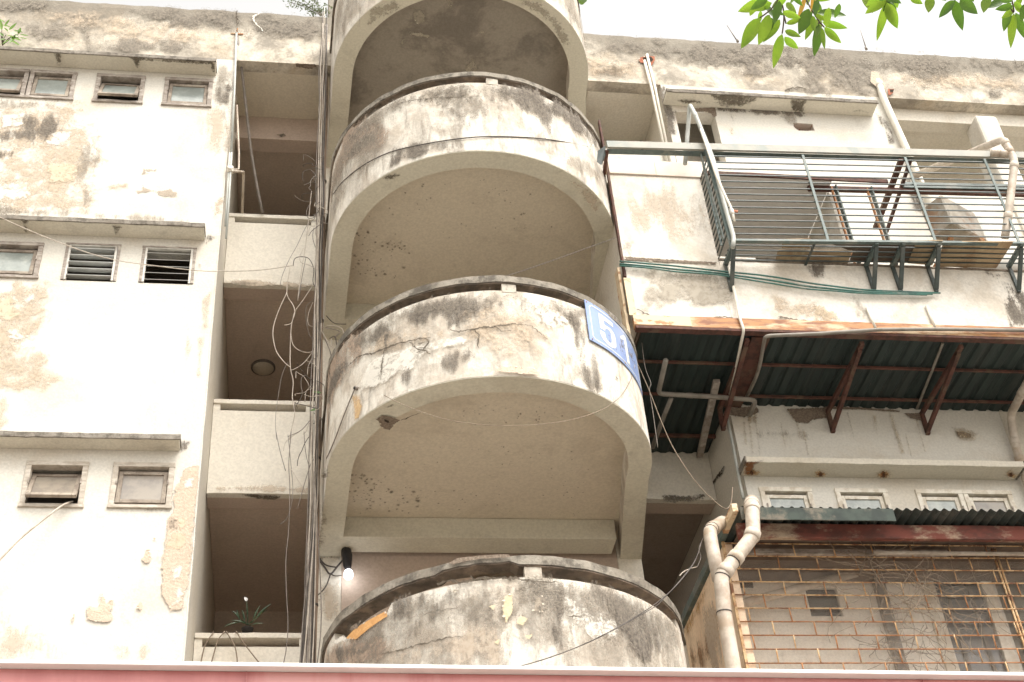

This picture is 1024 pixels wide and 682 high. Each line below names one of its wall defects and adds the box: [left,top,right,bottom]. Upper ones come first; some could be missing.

water stain [337,0,399,28]
water stain [568,0,1024,134]
water stain [330,84,599,209]
crack [349,323,547,379]
water stain [326,292,602,438]
spalling [376,415,400,430]
spalling [787,406,921,423]
peeling [141,464,199,611]
peeling [72,591,114,622]
peeling [489,594,544,639]